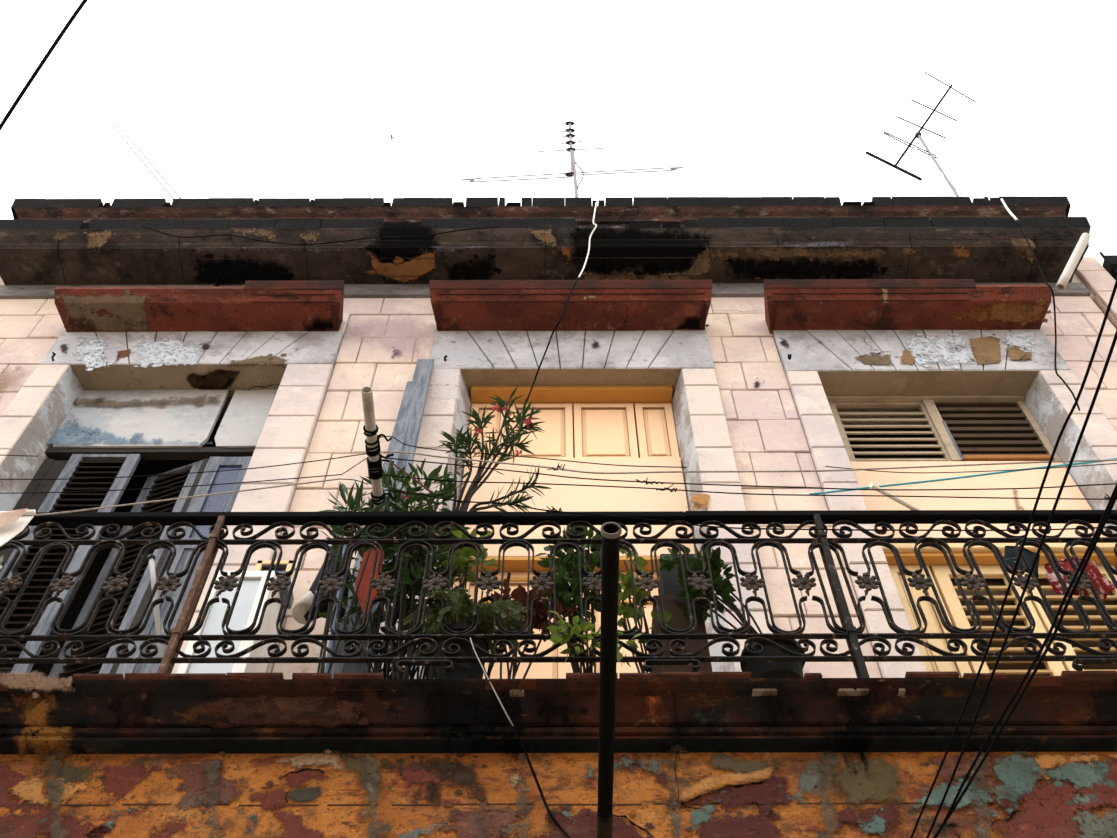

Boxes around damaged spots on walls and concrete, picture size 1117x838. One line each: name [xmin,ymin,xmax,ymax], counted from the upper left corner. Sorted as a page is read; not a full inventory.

leakage [194,222,502,287]
flaking render [366,251,436,282]
leakage [570,226,710,280]
leakage [723,236,888,280]
flaking render [54,289,287,408]
peeling [856,294,1051,369]
leakage [192,692,369,728]
peeling [0,749,343,838]
peeling [441,774,597,838]
peeling [666,752,805,838]
peeling [814,801,903,838]
peeling [929,751,1117,838]